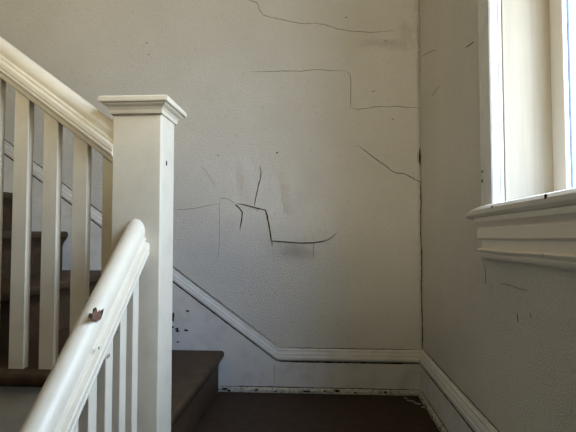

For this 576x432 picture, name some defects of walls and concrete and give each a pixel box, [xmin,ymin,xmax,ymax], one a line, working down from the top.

crack [249,0,395,33]
crack [299,69,419,110]
crack [173,147,499,432]